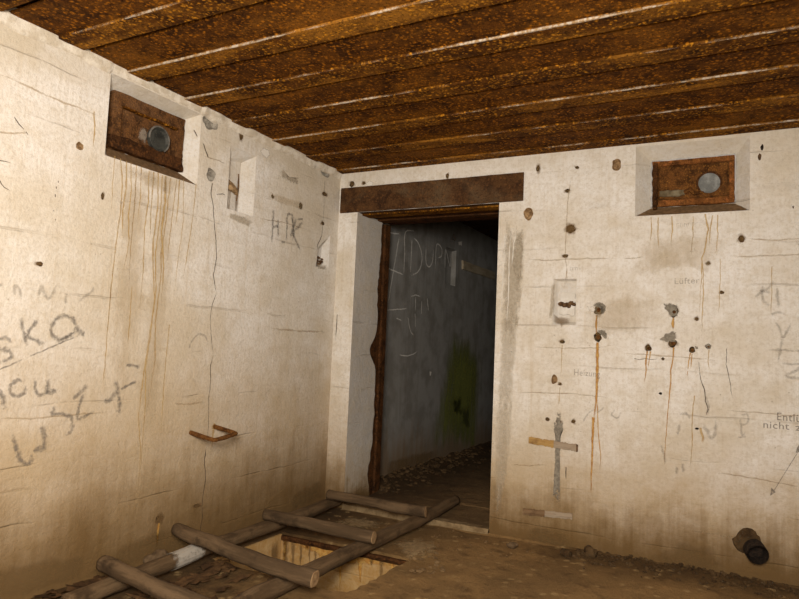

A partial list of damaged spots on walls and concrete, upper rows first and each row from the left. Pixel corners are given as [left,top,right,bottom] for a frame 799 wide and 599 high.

rust [105,147,196,447]
crack [209,183,225,393]
rust [637,203,747,316]
rust [590,342,601,487]